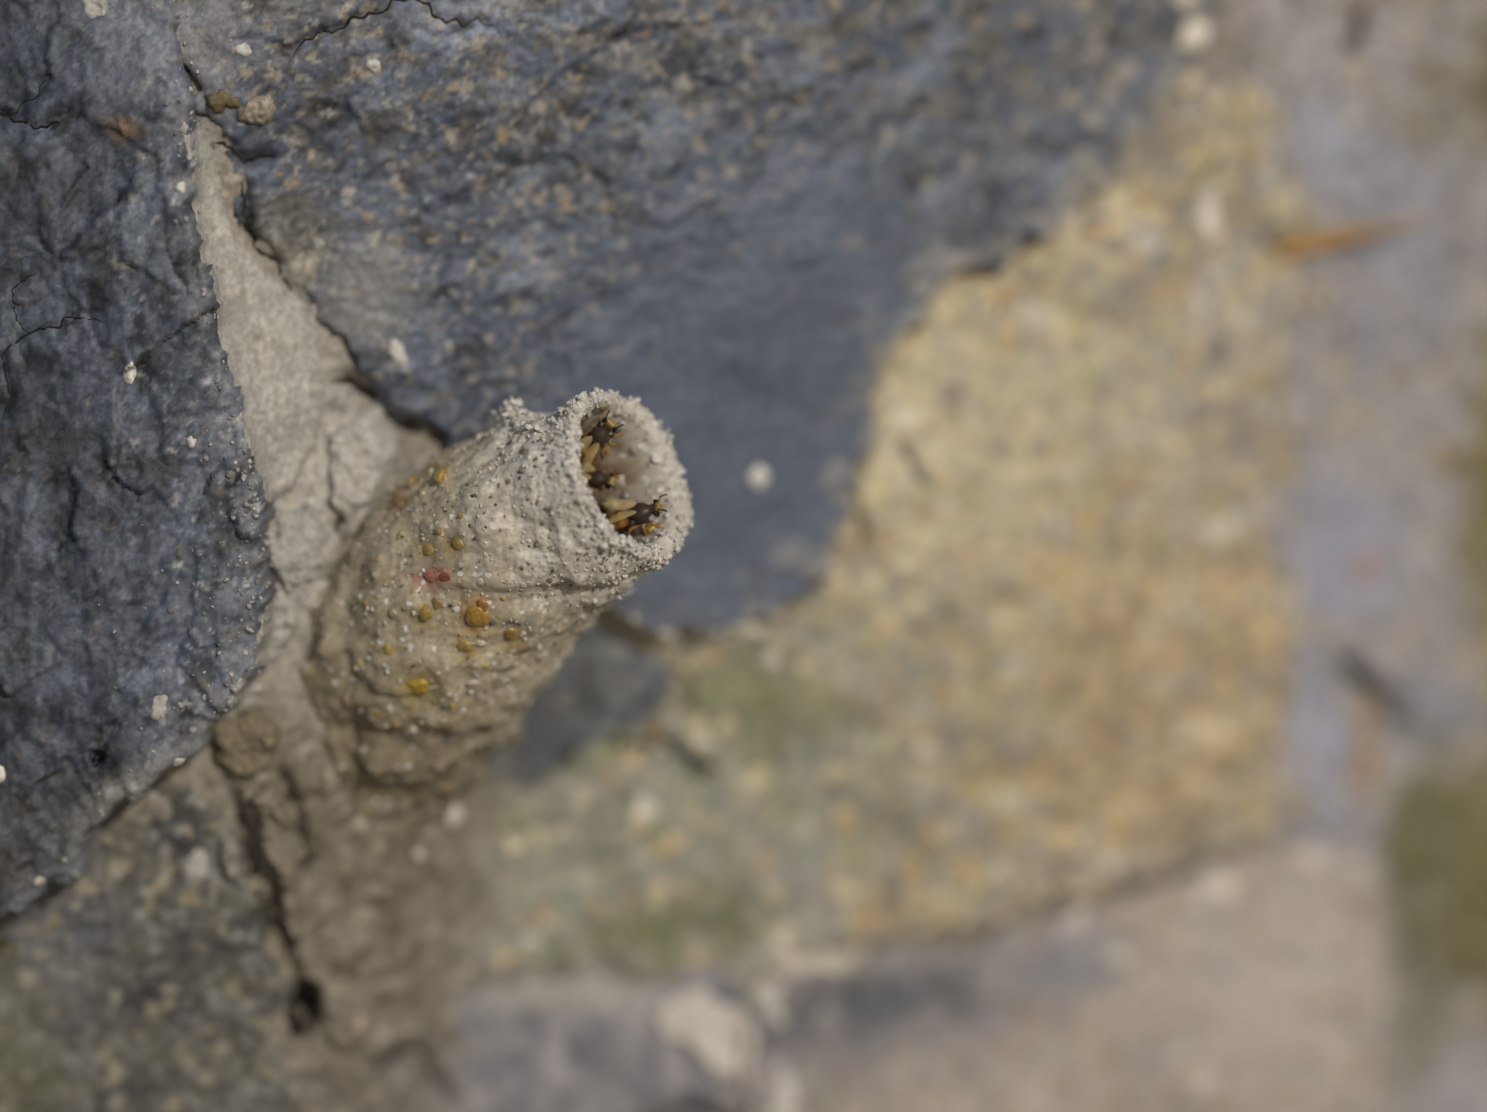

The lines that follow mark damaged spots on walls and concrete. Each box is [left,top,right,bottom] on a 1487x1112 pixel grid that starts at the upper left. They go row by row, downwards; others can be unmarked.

crack [288,0,503,63]
crack [0,81,60,130]
crack [1,270,103,419]
crack [278,765,310,881]